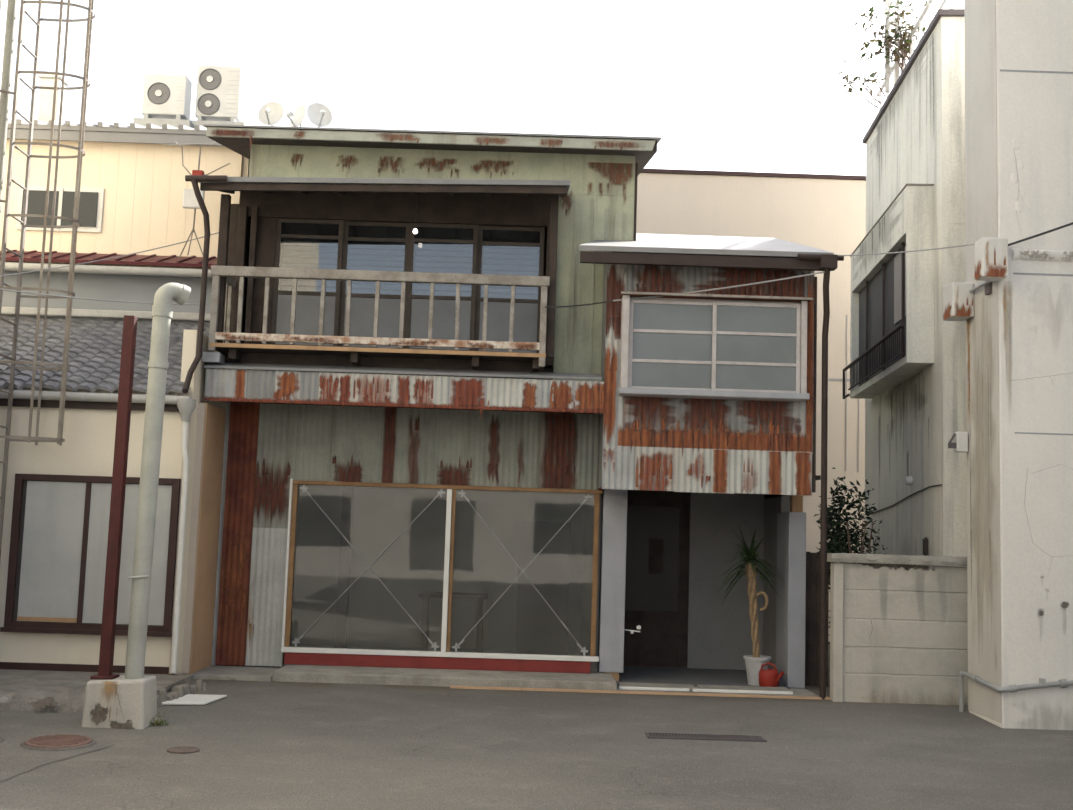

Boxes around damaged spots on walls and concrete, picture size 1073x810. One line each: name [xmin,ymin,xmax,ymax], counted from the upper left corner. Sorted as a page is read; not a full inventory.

rust [378,157,401,172]
rust [417,158,459,177]
rust [471,160,513,178]
rust [589,162,633,201]
rust [204,265,814,495]